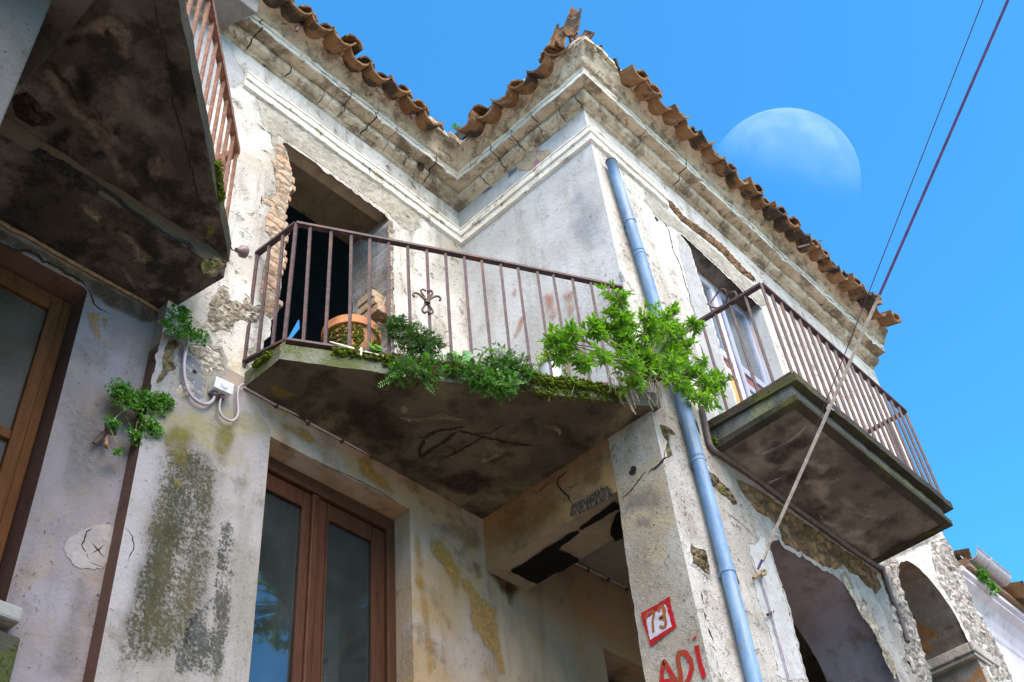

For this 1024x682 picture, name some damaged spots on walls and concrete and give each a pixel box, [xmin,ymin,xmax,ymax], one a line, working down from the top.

leakage [46,72,122,177]
crack [358,112,437,182]
crack [480,95,582,185]
spalling [151,93,425,402]
leakage [89,282,158,334]
crack [418,424,541,459]
spalling [571,486,614,516]
crack [623,448,669,497]
crack [81,529,103,567]
mould [120,428,234,675]
spalling [708,470,932,682]
spalling [928,535,1013,682]